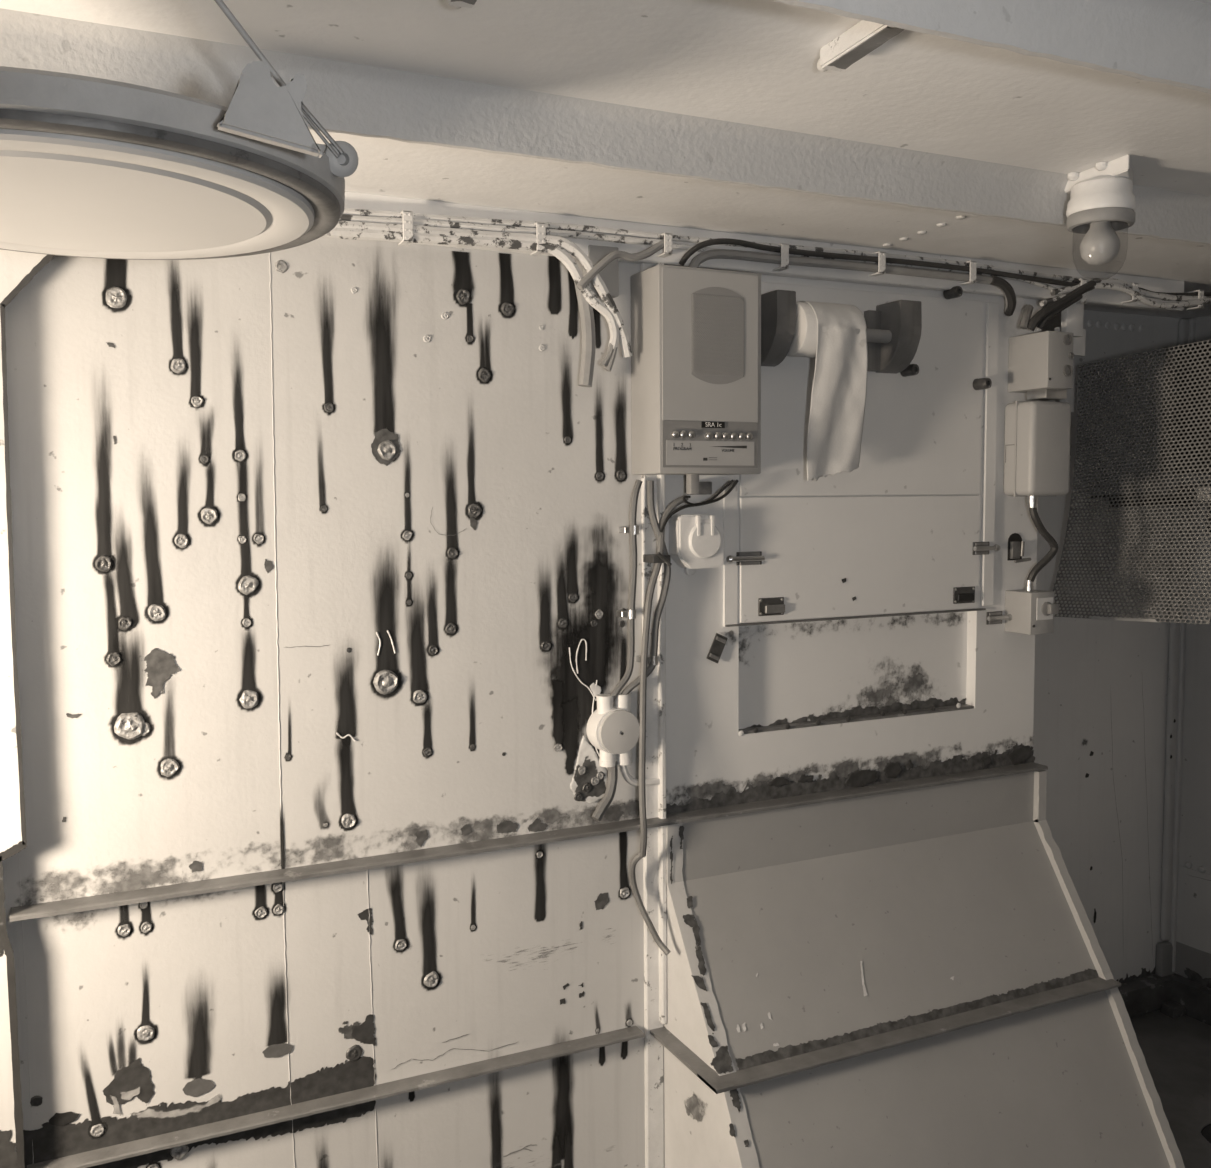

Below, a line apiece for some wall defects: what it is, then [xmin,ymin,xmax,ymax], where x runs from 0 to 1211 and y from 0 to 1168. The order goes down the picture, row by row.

corrosion [144,648,180,699]
peeling [670,826,684,884]
corrosion [358,908,373,935]
corrosion [594,893,609,910]
peeling [683,896,1098,1074]
peeling [103,1033,221,1118]
peeling [729,1089,749,1147]